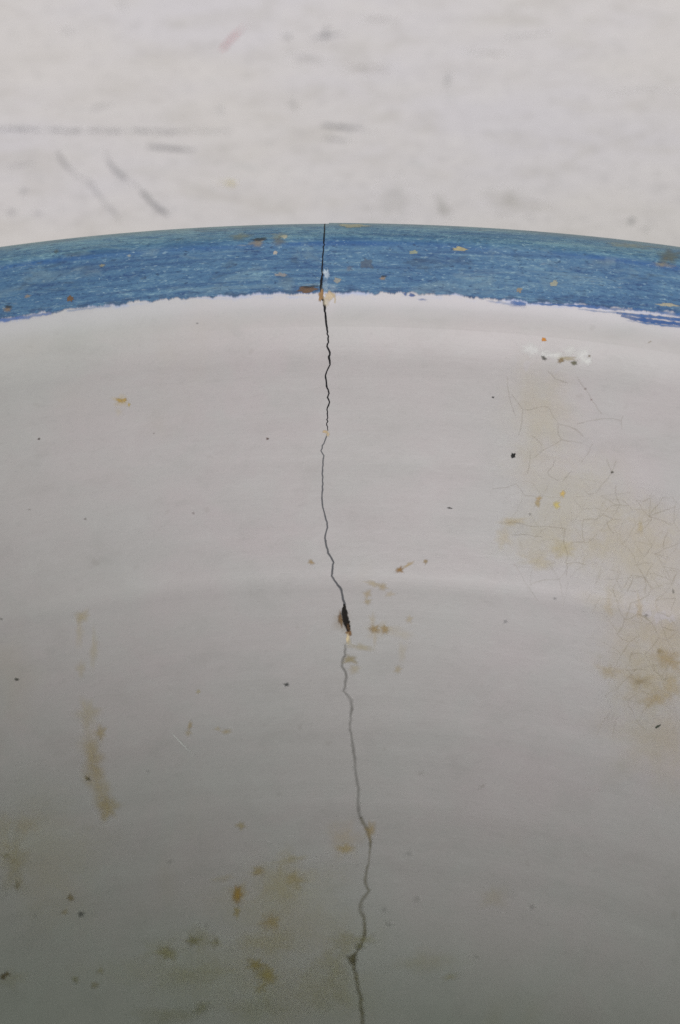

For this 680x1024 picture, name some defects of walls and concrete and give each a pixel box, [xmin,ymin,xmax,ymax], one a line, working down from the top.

crack [320,224,350,632]